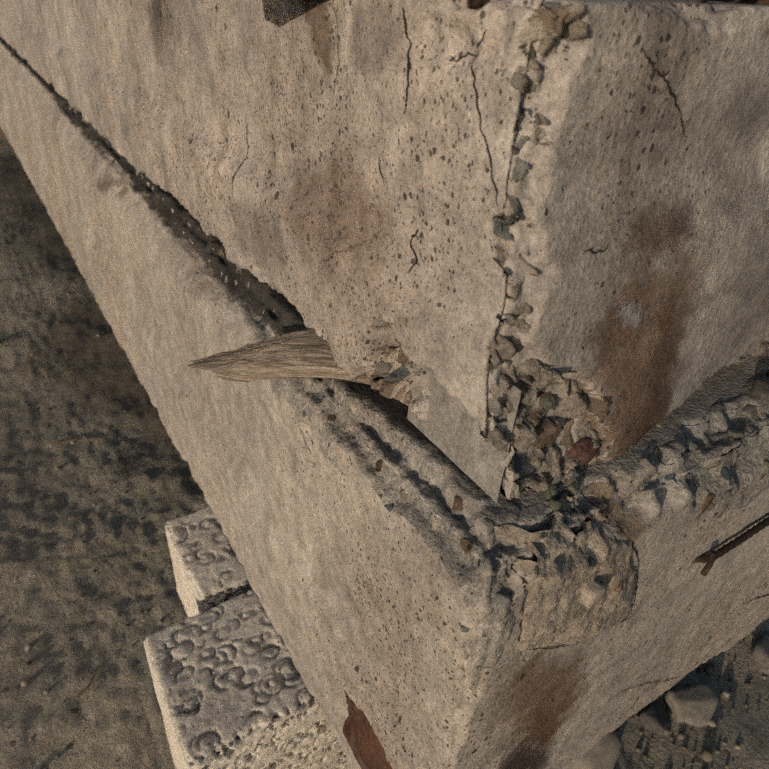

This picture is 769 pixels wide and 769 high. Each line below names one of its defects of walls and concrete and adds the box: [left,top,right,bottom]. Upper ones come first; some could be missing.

crack [402,7,411,114]
crack [451,30,499,211]
spalling [508,106,552,181]
spalling [510,1,589,93]
crack [643,49,686,137]
spalling [212,268,279,341]
rust [590,270,693,460]
spalling [267,193,609,674]
rust [342,690,392,769]
rust [506,660,579,744]